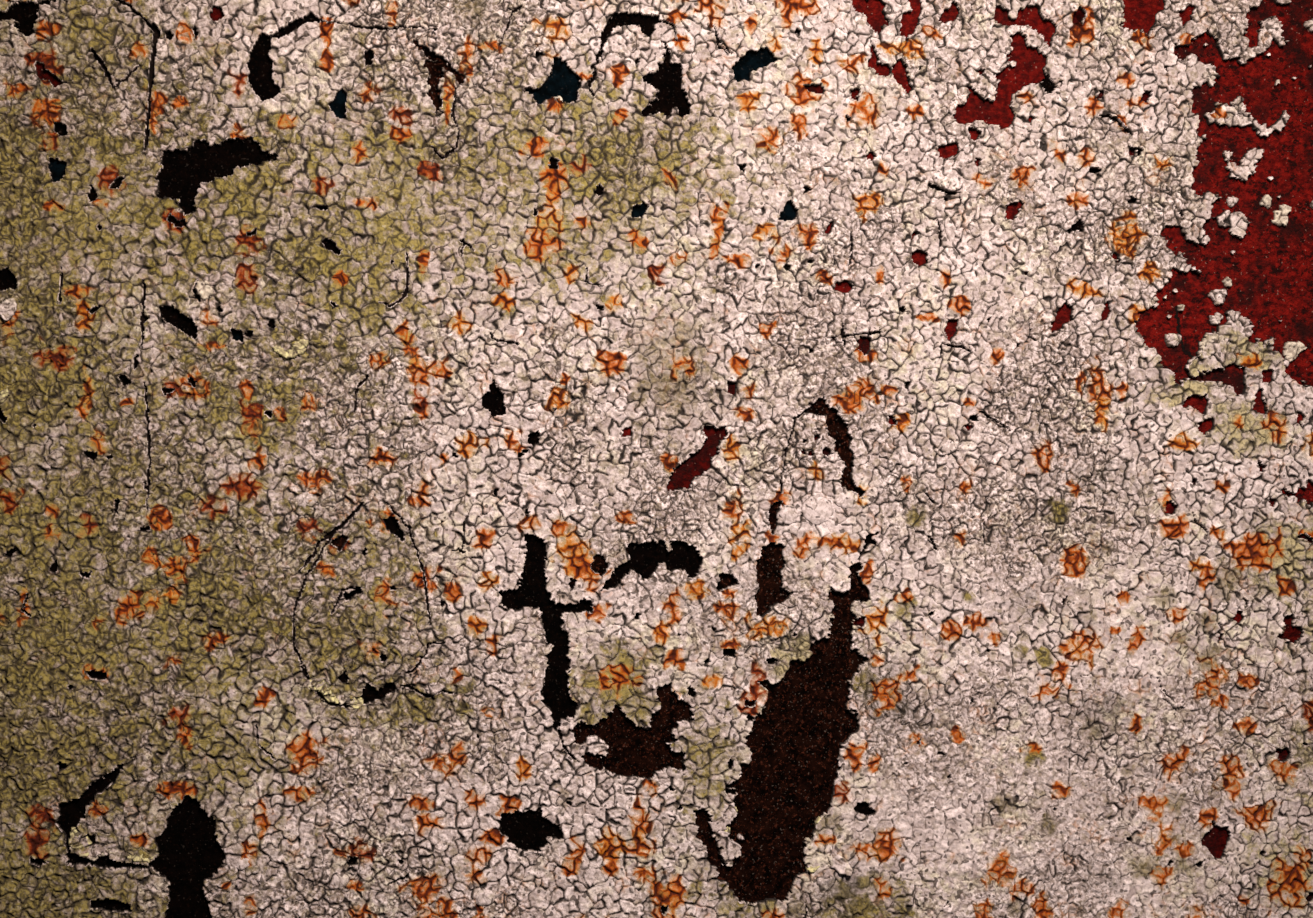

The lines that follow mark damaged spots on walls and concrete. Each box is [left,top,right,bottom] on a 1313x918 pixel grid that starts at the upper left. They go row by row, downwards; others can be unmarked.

crack [91,0,160,150]
corrosion [518,136,593,263]
crack [928,184,961,247]
peeling [1134,0,1313,434]
crack [139,280,147,348]
crack [292,502,452,696]
peeling [499,535,701,778]
peeling [677,532,878,903]
corrosion [1210,525,1313,596]
peeling [57,763,225,918]
corrosion [465,755,532,884]
corrosion [561,779,687,918]